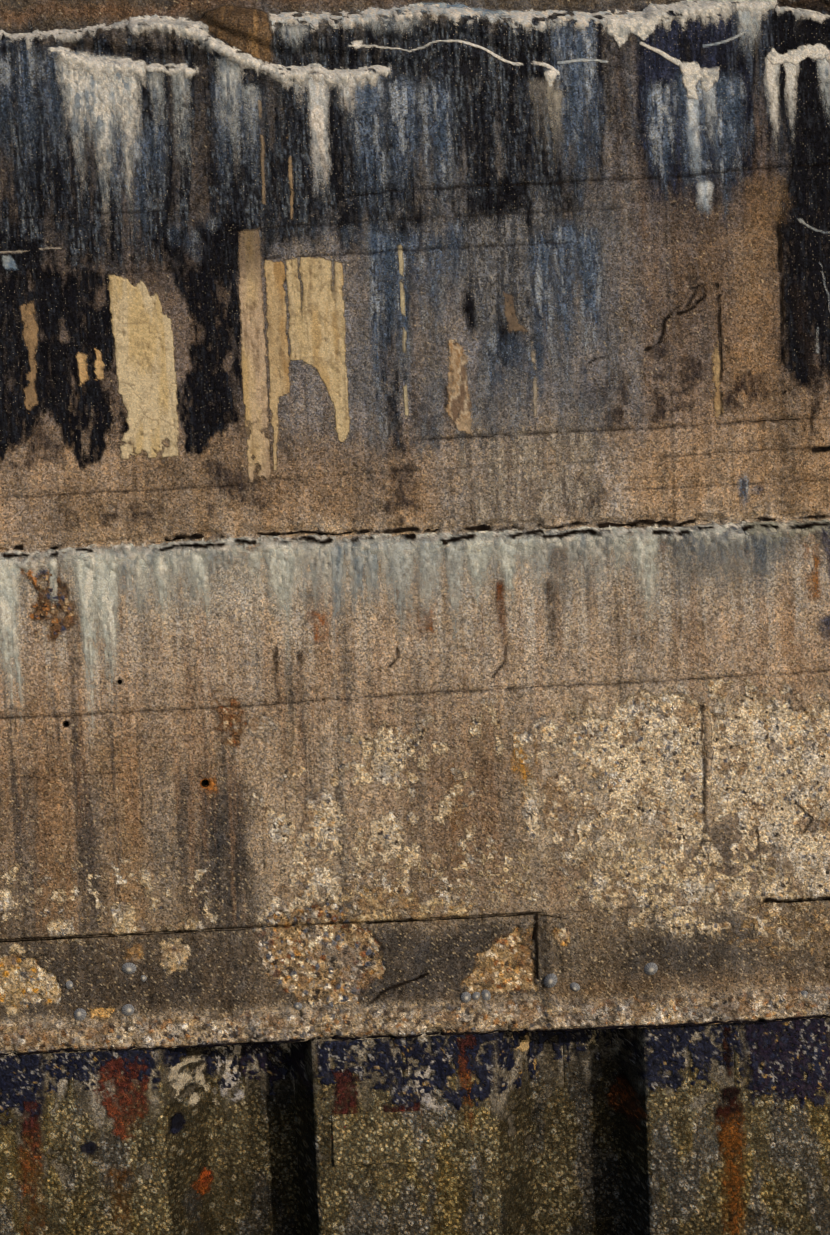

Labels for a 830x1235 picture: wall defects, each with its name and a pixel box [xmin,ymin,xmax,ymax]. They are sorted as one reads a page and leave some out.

peeling [76,275,179,460]
peeling [239,229,350,482]
leakage [0,0,830,721]
spalling [21,566,77,640]
rust [805,546,820,599]
spalling [0,675,830,1117]
rust [93,1056,150,1140]
rust [715,1027,747,1235]